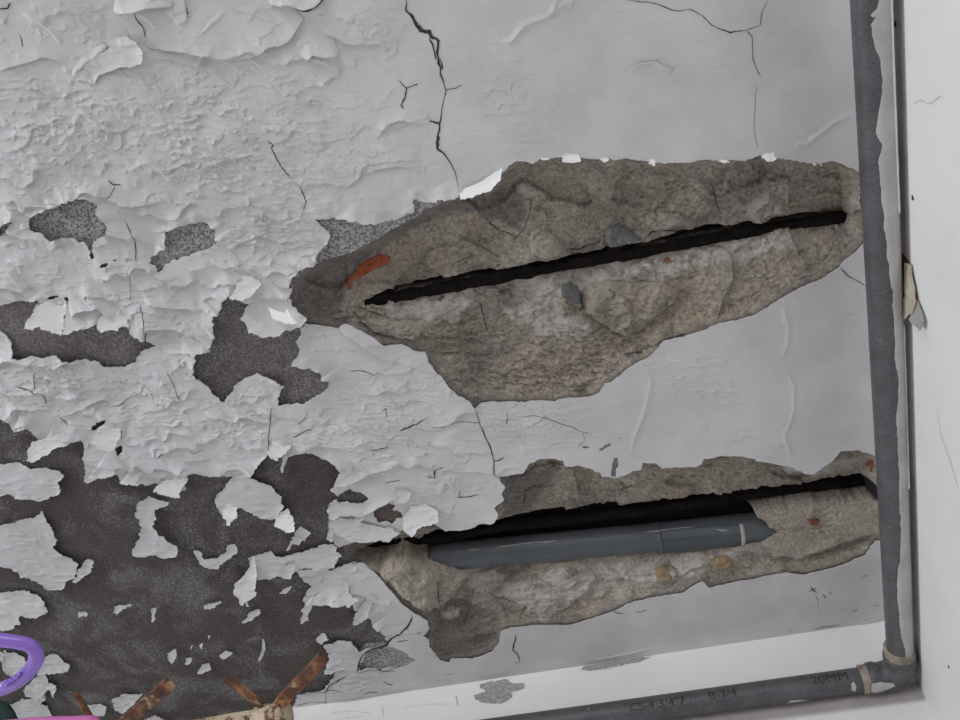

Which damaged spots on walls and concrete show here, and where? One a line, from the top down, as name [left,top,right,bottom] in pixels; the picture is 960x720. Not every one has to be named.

peeling [0,35,78,76]
peeling [113,0,393,87]
peeling [370,104,430,138]
crack [405,1,461,183]
crack [628,0,768,146]
peeling [29,199,116,268]
corrosion [344,255,391,291]
spalling [150,152,863,408]
peeling [901,254,924,331]
peeling [0,296,155,367]
crack [372,409,504,477]
peeling [0,419,880,720]